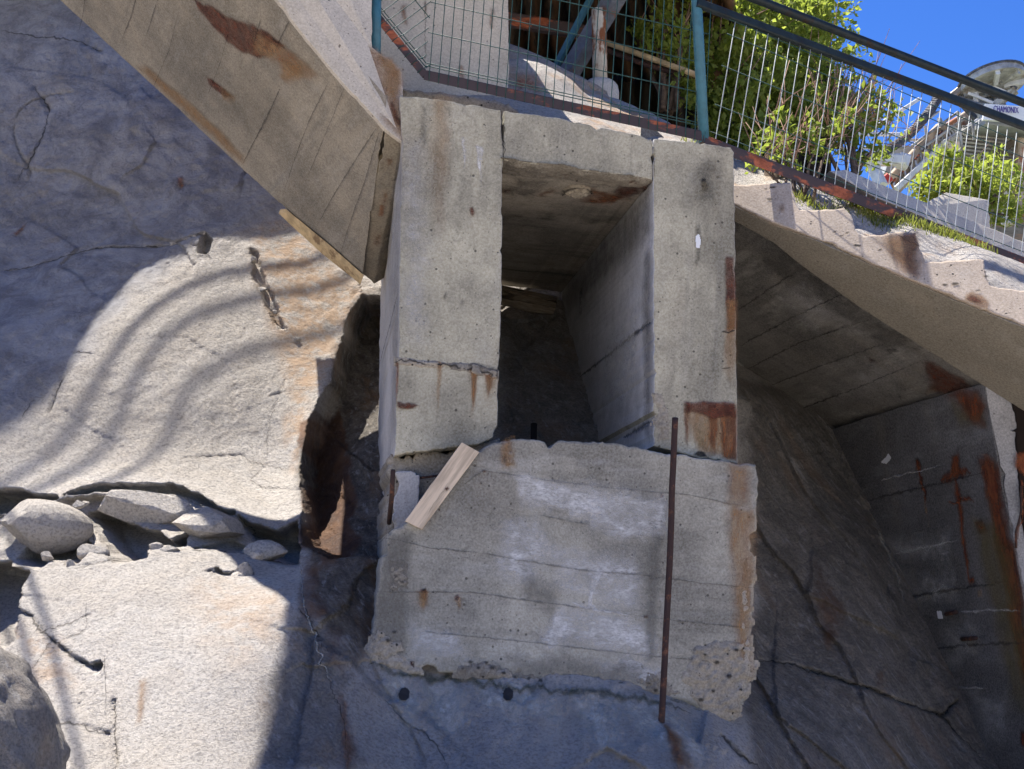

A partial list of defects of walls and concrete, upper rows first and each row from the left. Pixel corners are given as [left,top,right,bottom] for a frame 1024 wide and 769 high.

rust [195,0,311,79]
rust [586,181,648,203]
rust [890,235,919,273]
rust [722,257,736,343]
crack [380,302,499,381]
rust [396,363,417,409]
rust [472,373,492,401]
rust [684,401,753,660]
rust [940,453,1024,701]
spalling [364,629,424,676]
spalling [452,661,555,683]
spalling [598,554,760,721]